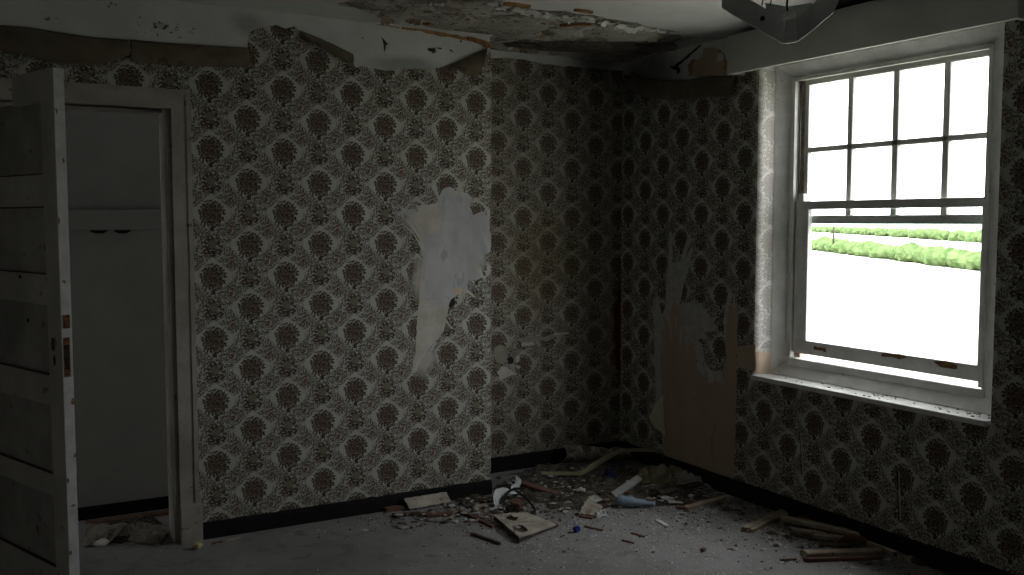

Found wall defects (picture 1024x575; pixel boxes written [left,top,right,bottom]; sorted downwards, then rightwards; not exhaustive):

peeling [337,0,683,63]
peeling [400,185,491,376]
peeling [649,232,771,477]